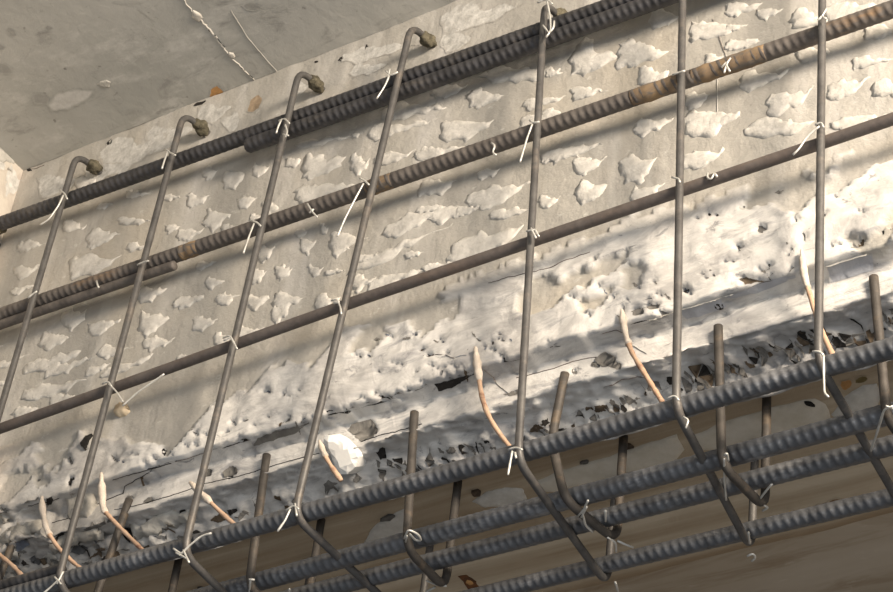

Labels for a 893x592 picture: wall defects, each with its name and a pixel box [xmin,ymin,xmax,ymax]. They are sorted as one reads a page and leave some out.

corrosion [629,75,677,106]
corrosion [689,44,768,84]
corrosion [363,173,394,195]
corrosion [177,240,199,260]
spalling [617,264,796,325]
spalling [0,245,302,418]
spalling [523,308,893,450]
spalling [80,434,93,451]
spalling [213,415,309,450]
flaking render [323,352,496,494]
flaking render [537,434,684,492]
spalling [0,493,200,576]